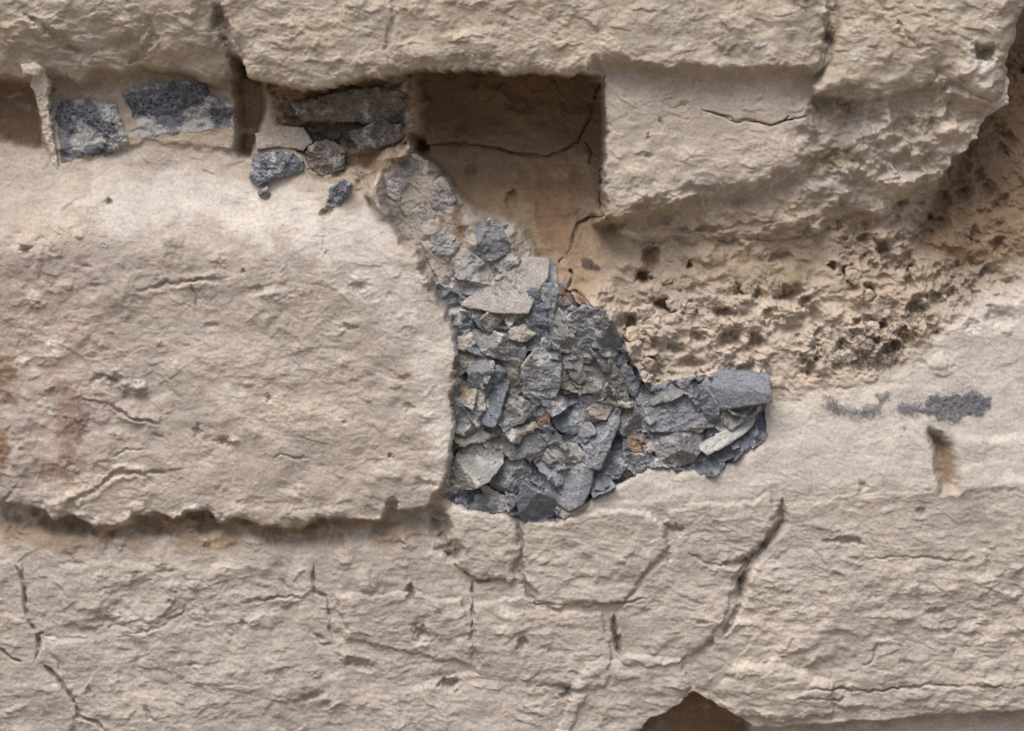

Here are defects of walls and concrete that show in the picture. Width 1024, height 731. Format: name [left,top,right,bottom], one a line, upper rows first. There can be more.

crack [701,109,811,126]
crack [423,75,610,307]
spalling [382,8,1024,523]
crack [0,564,104,730]
crack [313,571,333,645]
crack [611,615,621,657]
crack [722,500,784,636]